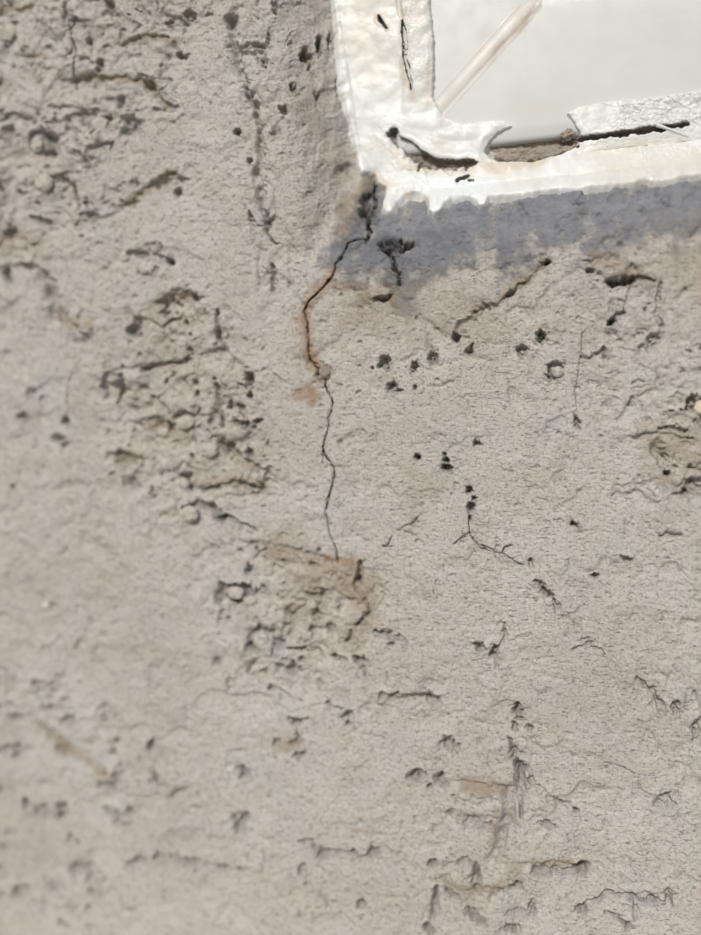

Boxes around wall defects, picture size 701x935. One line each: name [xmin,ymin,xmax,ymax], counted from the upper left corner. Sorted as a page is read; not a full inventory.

crack [400,19,412,91]
crack [577,122,690,148]
spalling [99,288,273,526]
crack [304,184,403,562]
spalling [649,392,701,498]
crack [454,516,519,564]
spalling [241,540,409,698]